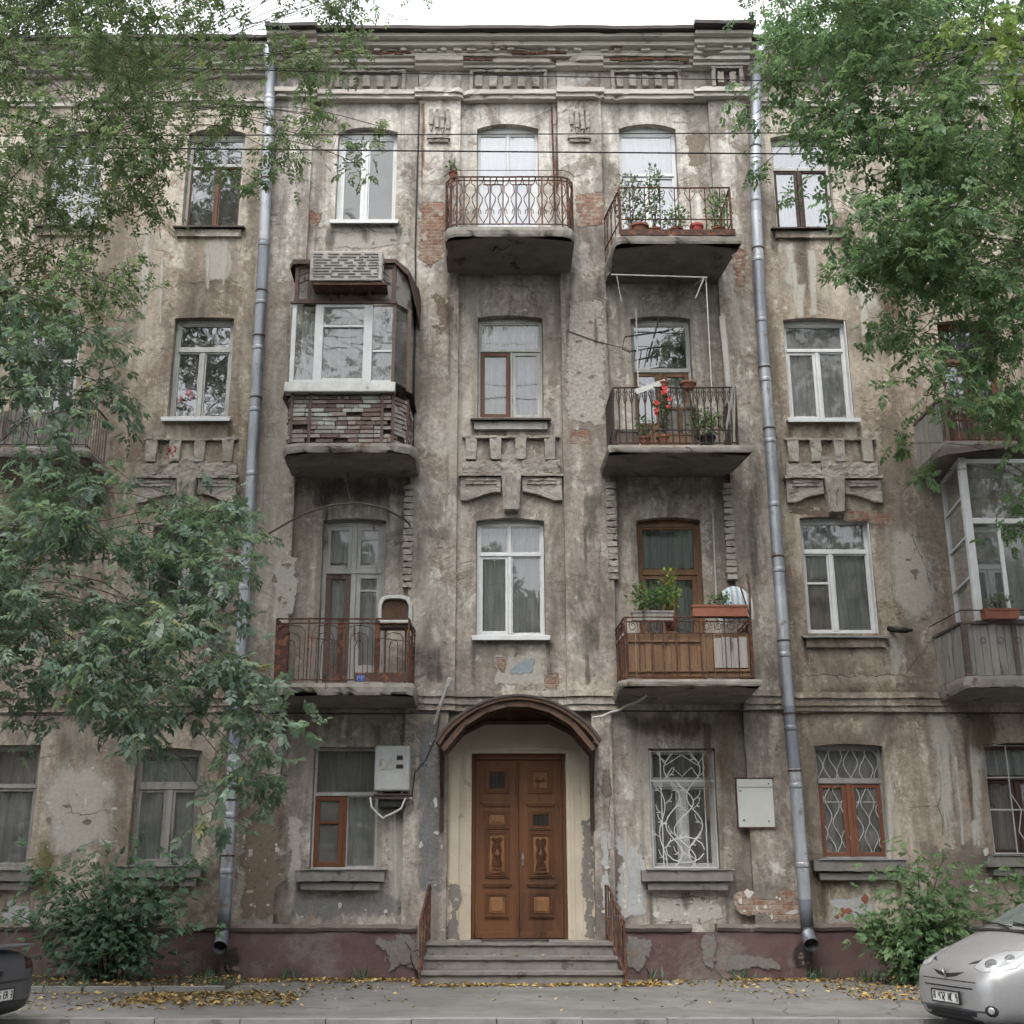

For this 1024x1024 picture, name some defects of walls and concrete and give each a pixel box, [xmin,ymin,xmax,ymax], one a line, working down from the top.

spalling [309,201,445,269]
spalling [575,191,605,228]
peeling [272,557,300,618]
peeling [493,653,560,688]
peeling [234,789,403,922]
peeling [581,819,723,939]
spalling [733,888,800,922]
peeling [829,894,875,923]